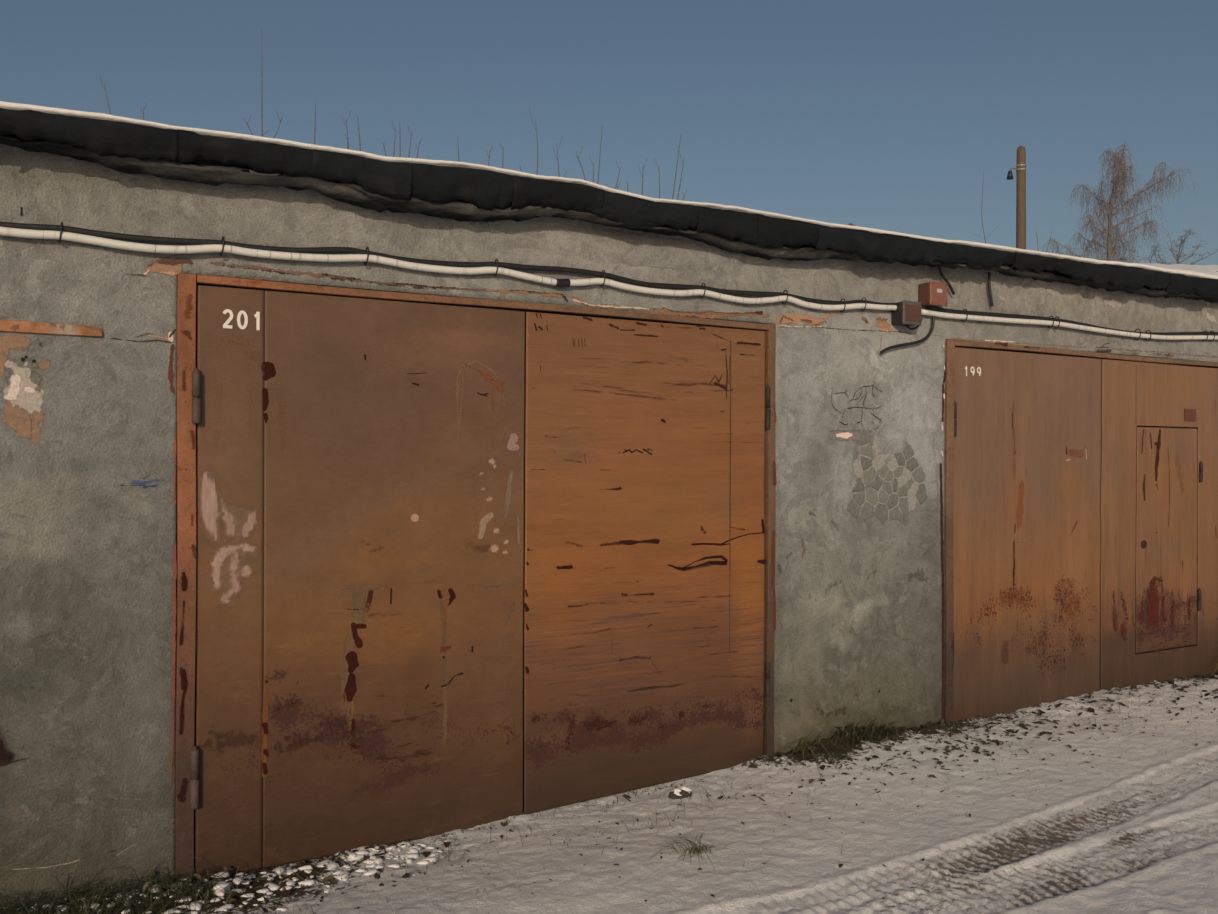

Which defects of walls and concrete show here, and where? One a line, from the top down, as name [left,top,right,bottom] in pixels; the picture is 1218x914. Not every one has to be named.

spalling [0,334,50,444]
corrosion [261,590,442,777]
corrosion [968,482,1089,680]
corrosion [1102,576,1204,654]